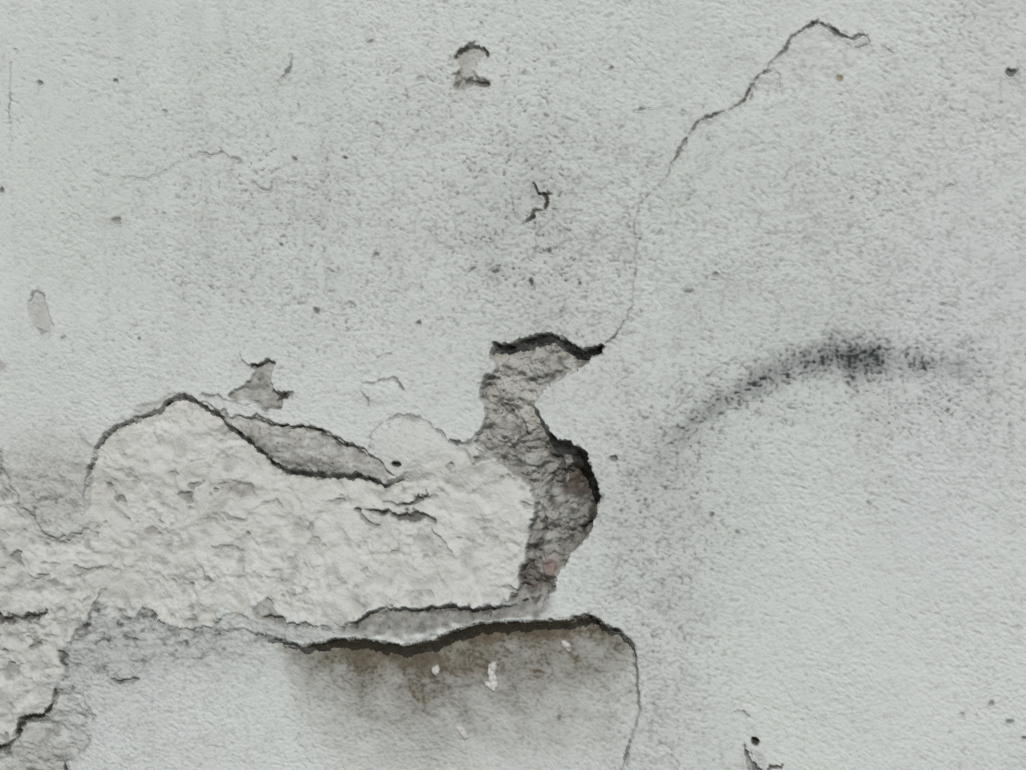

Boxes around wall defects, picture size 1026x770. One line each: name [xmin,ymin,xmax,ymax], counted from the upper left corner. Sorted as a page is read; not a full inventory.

peeling [449,21,494,93]
crack [523,178,559,254]
crack [603,17,896,345]
spalling [0,329,607,770]
peeling [738,736,785,770]